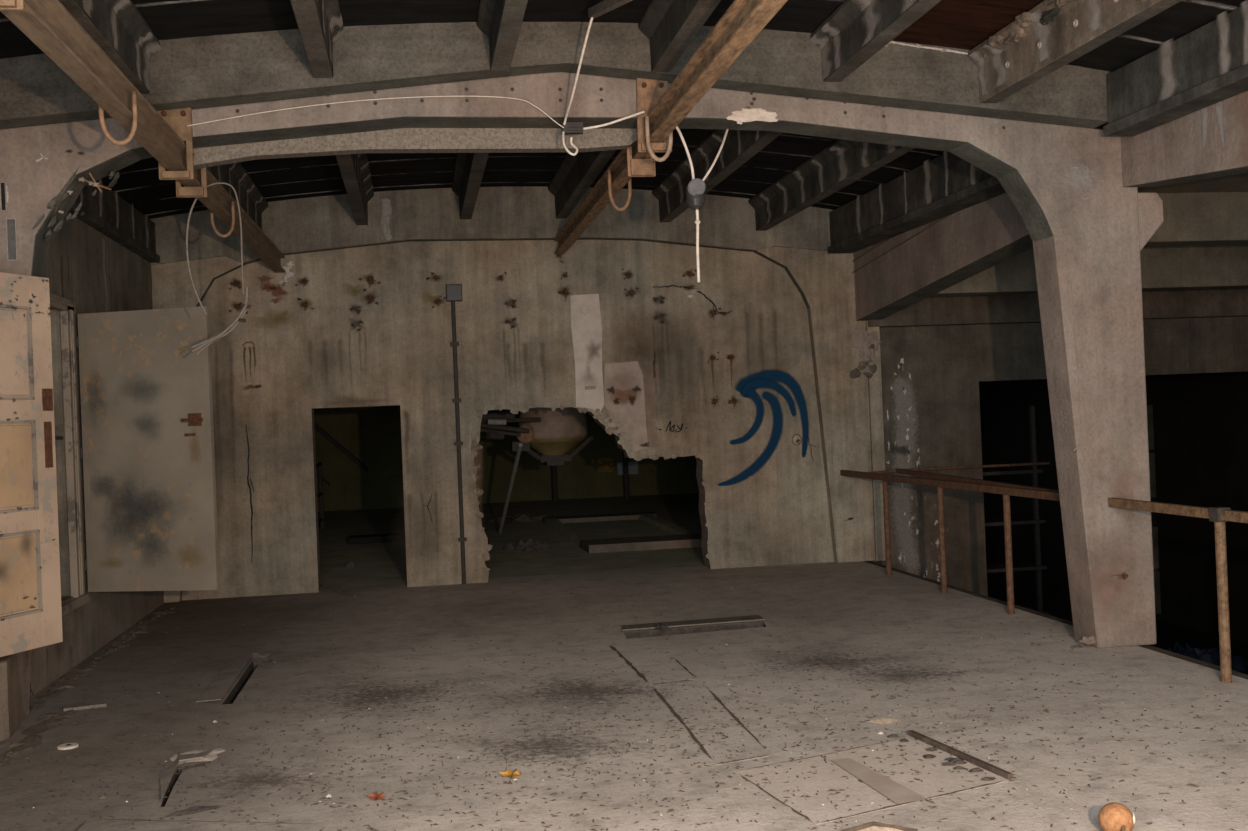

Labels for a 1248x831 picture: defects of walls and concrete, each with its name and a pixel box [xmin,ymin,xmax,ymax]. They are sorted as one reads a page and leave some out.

spalling [983,0,1073,57]
rust [359,276,381,305]
spalling [551,401,677,461]
spalling [470,404,529,573]